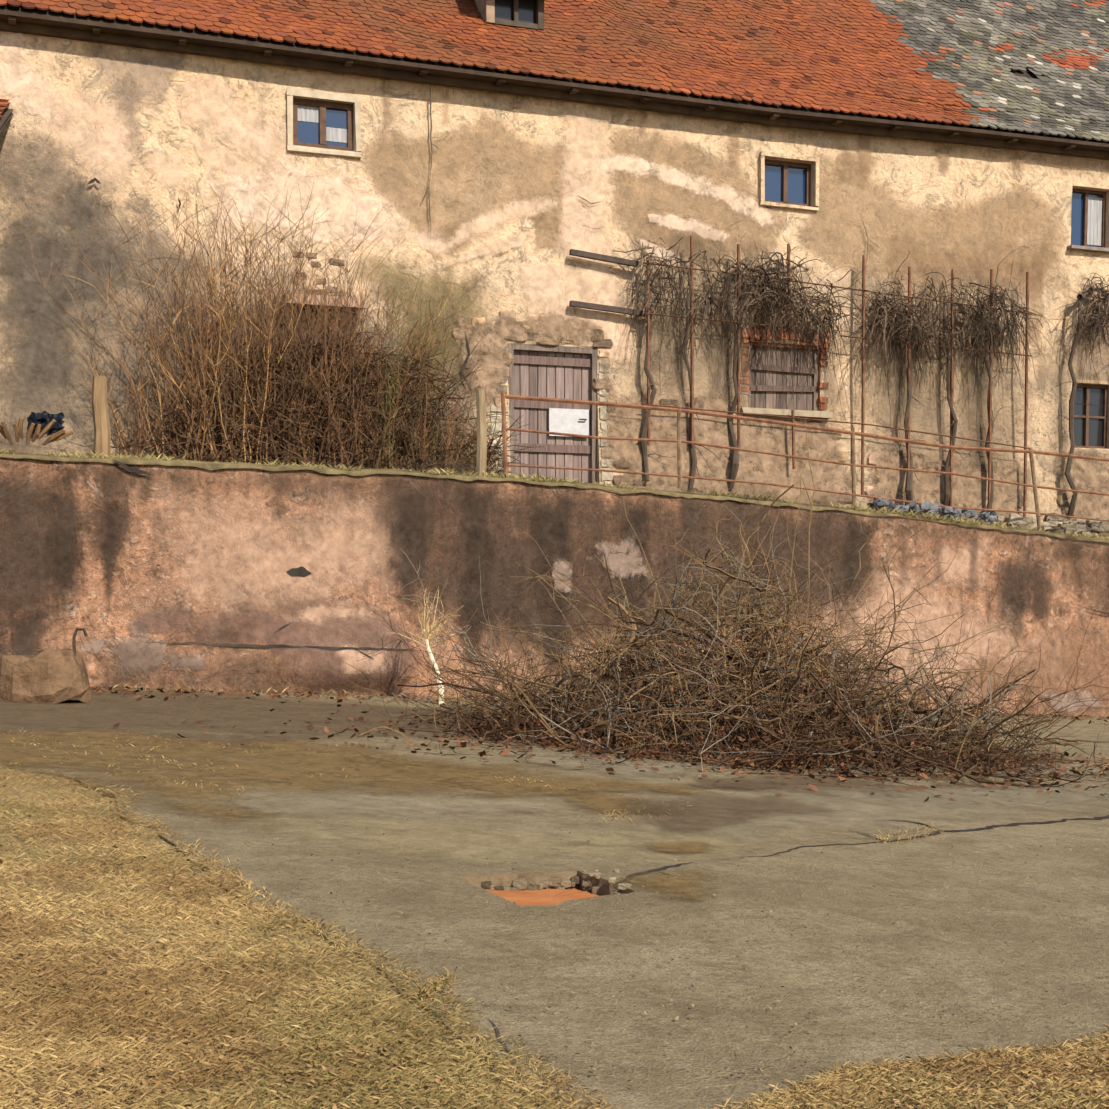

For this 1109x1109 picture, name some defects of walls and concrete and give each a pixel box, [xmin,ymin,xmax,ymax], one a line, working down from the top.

damp [29,46,183,181]
damp [183,76,290,183]
damp [0,119,1101,748]
damp [633,776,1109,830]
crack [718,794,1109,860]
hole [456,869,645,906]
crack [618,862,692,883]